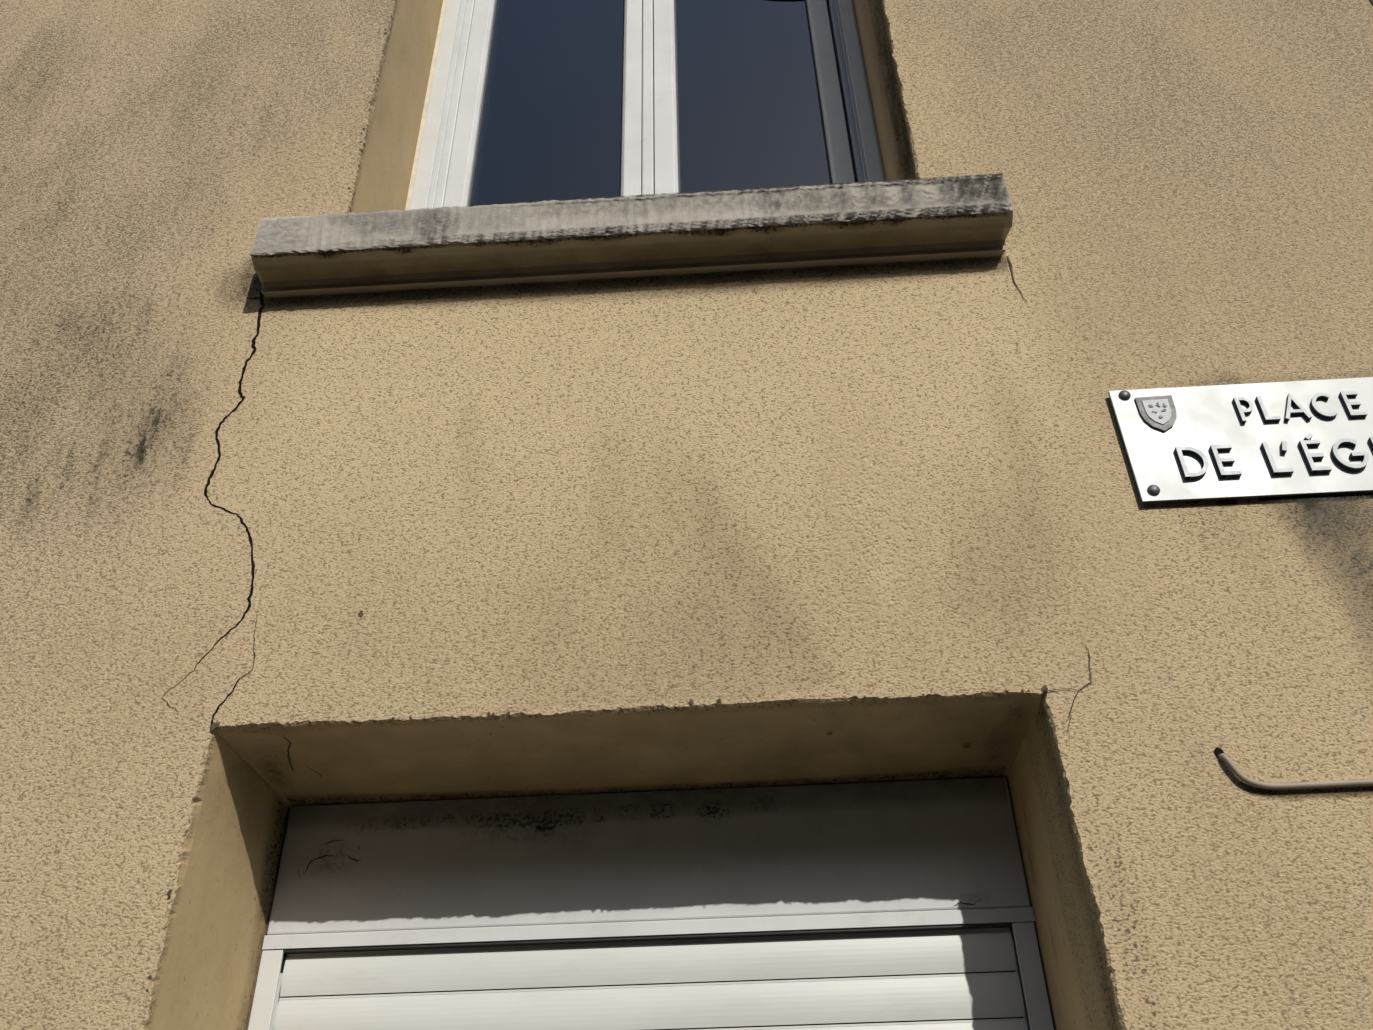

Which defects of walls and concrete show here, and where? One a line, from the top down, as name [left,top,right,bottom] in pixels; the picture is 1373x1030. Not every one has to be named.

crack [162,287,265,724]
leakage [241,741,1007,1030]